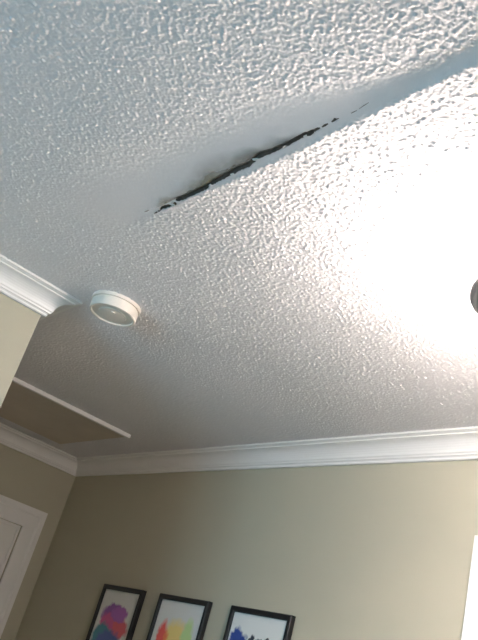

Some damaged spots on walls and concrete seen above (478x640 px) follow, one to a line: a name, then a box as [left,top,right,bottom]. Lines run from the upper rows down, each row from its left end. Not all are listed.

crack [145,102,369,214]